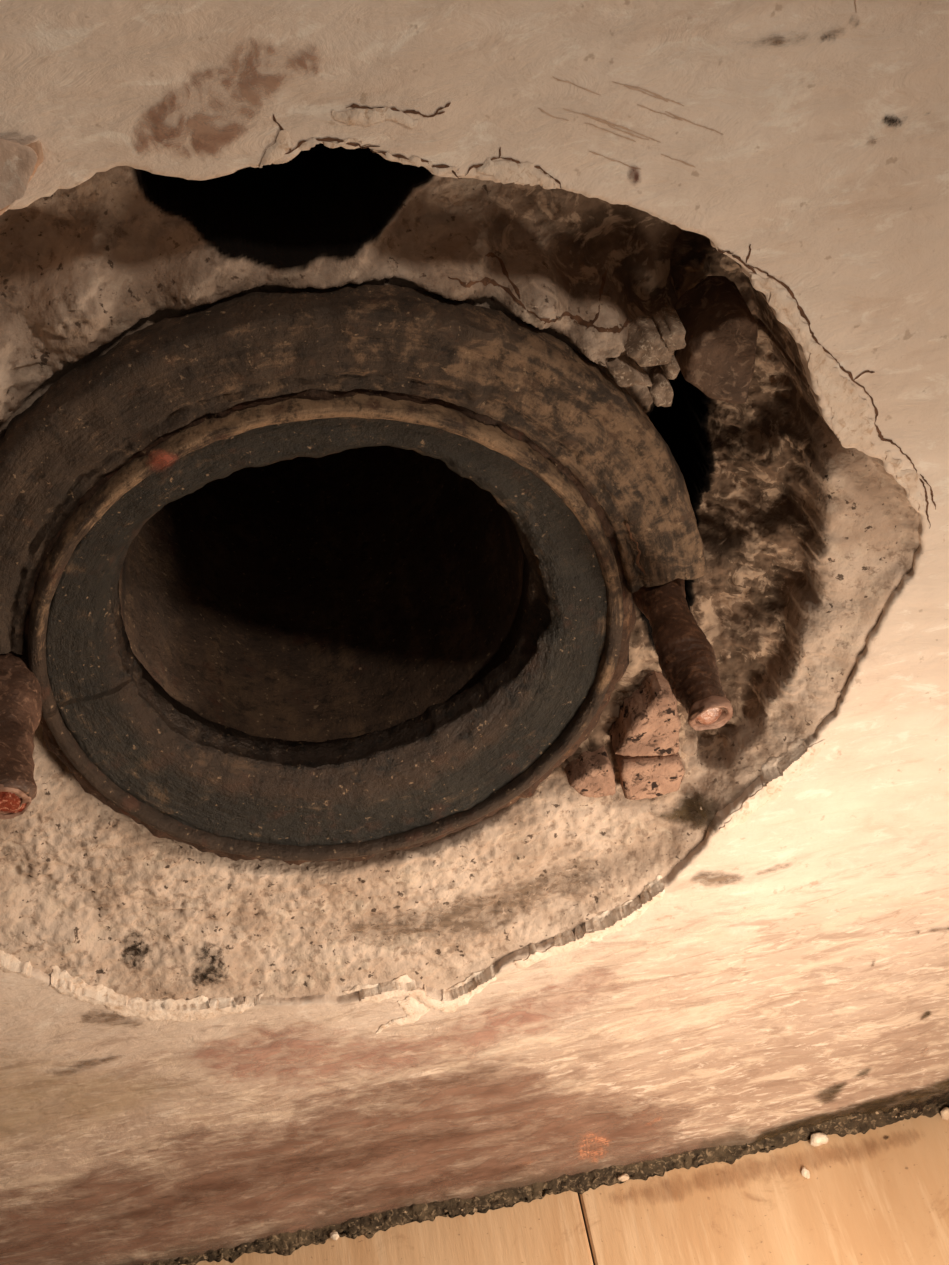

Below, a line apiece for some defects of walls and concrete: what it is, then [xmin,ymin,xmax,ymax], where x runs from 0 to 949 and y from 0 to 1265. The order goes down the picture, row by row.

damp [135,44,318,156]
crack [346,102,451,117]
crack [273,114,561,188]
crack [448,252,631,333]
crack [718,244,936,529]
spalling [0,107,926,1034]
damp [64,1058,115,1073]
damp [82,1014,139,1026]
damp [195,1004,555,1079]
damp [756,1080,949,1142]
damp [0,1074,674,1265]